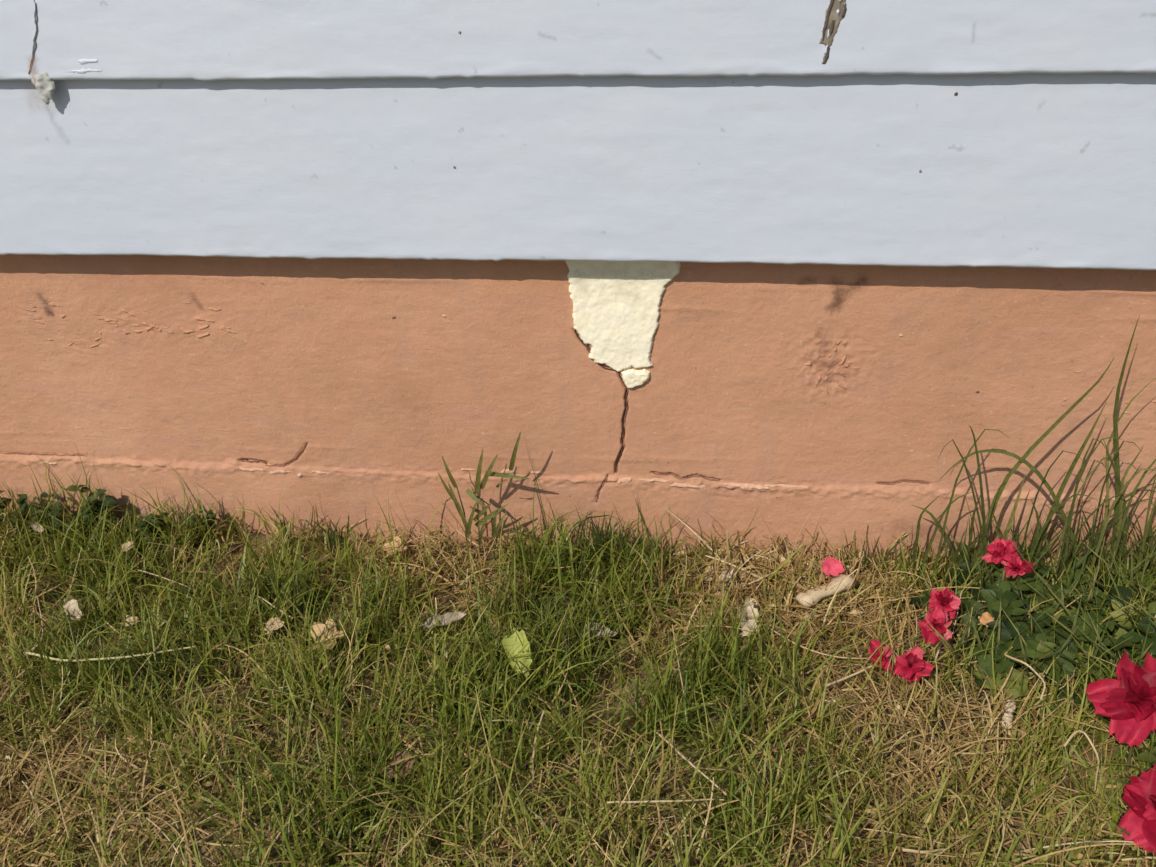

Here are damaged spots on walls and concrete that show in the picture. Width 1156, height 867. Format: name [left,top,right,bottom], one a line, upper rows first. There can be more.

crack [28,1,38,74]
peeling [819,0,847,64]
spalling [565,261,681,388]
crack [574,329,628,502]
crack [652,472,720,481]